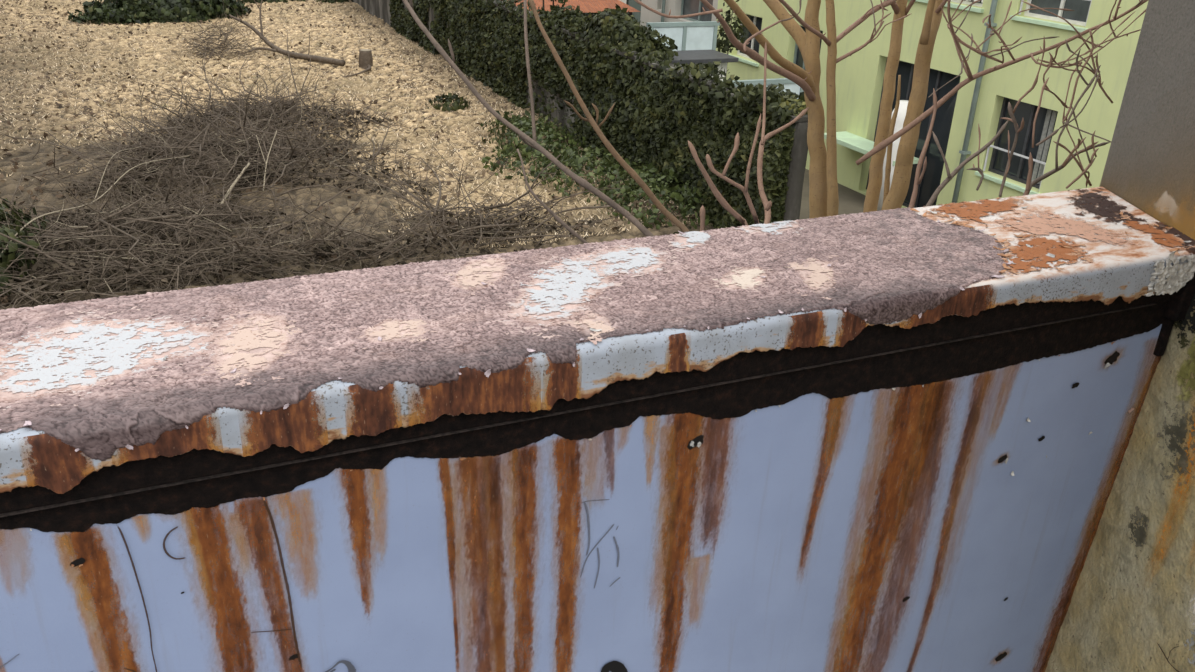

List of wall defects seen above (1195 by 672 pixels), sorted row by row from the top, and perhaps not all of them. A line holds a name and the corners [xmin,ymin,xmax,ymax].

rust [24,433,95,494]
rust [59,528,140,672]
rust [186,492,313,672]
rust [439,445,537,672]
rust [554,438,581,672]
peeling [0,188,1195,532]
rust [645,412,731,672]
rust [833,381,952,672]
rust [899,284,995,329]
rust [907,372,991,672]
rust [922,191,1195,275]
damp [1157,293,1195,486]